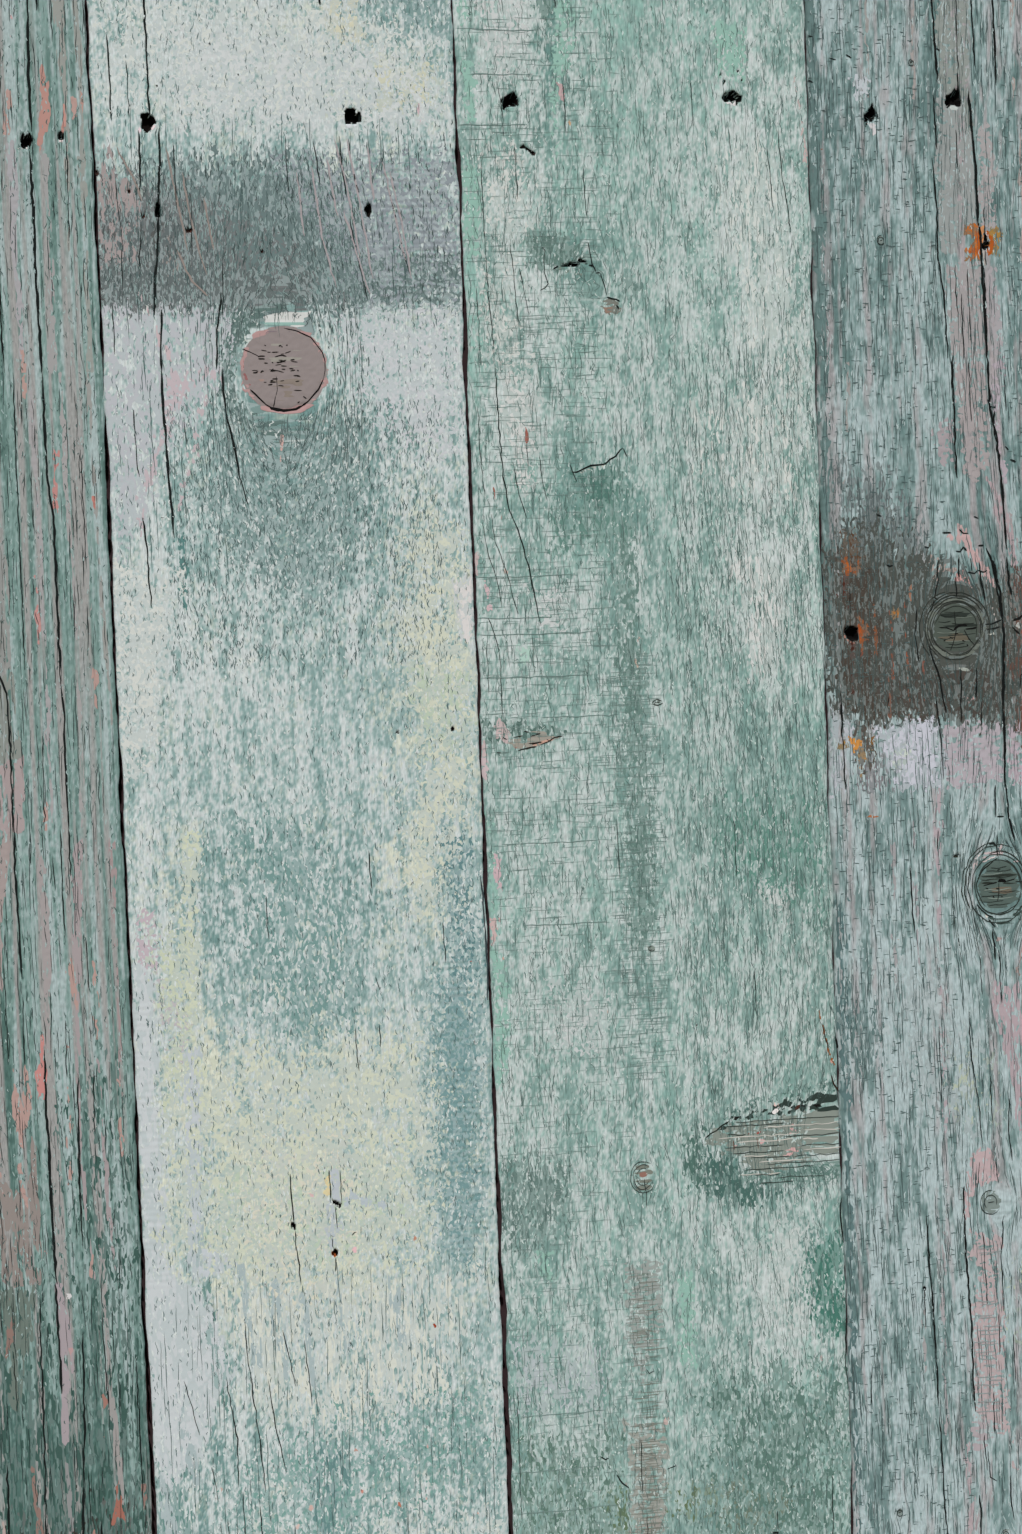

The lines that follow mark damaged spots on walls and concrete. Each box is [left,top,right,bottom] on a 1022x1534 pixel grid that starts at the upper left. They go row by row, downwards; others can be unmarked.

crack [242,0,302,63]
crack [323,0,446,68]
crack [342,34,436,112]
corrosion [964,223,1003,261]
leakage [793,0,1022,795]
corrosion [836,527,925,718]
leakage [0,0,636,1534]
crack [360,761,453,865]
crack [154,689,425,1081]
crack [108,937,273,1080]
crack [233,998,336,1124]
crack [395,1014,476,1085]